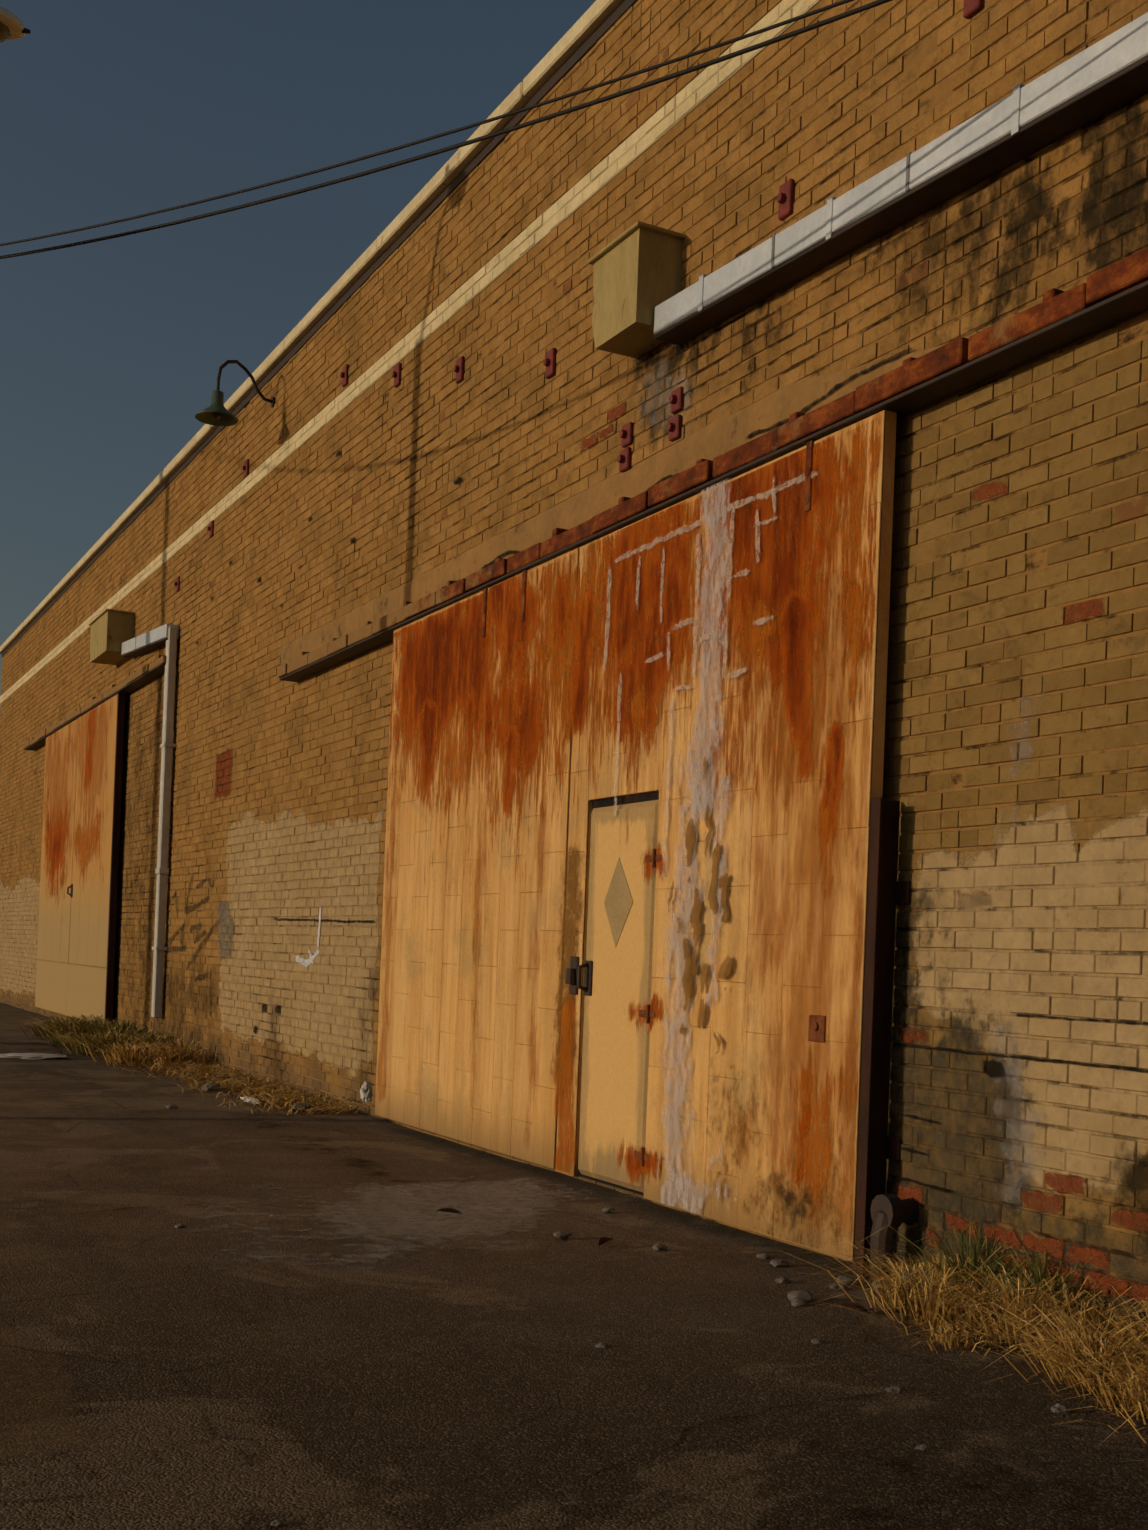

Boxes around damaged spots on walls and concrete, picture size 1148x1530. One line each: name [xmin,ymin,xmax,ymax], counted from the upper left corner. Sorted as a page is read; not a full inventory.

leakage [995,157,1045,307]
leakage [1082,99,1148,269]
rust [44,706,111,895]
rust [389,424,880,1224]
leakage [661,481,729,1209]
spalling [253,1004,281,1052]
spalling [891,1175,951,1203]
leakage [885,894,1148,1338]
spalling [926,1213,1148,1304]
spalling [1022,1173,1087,1212]